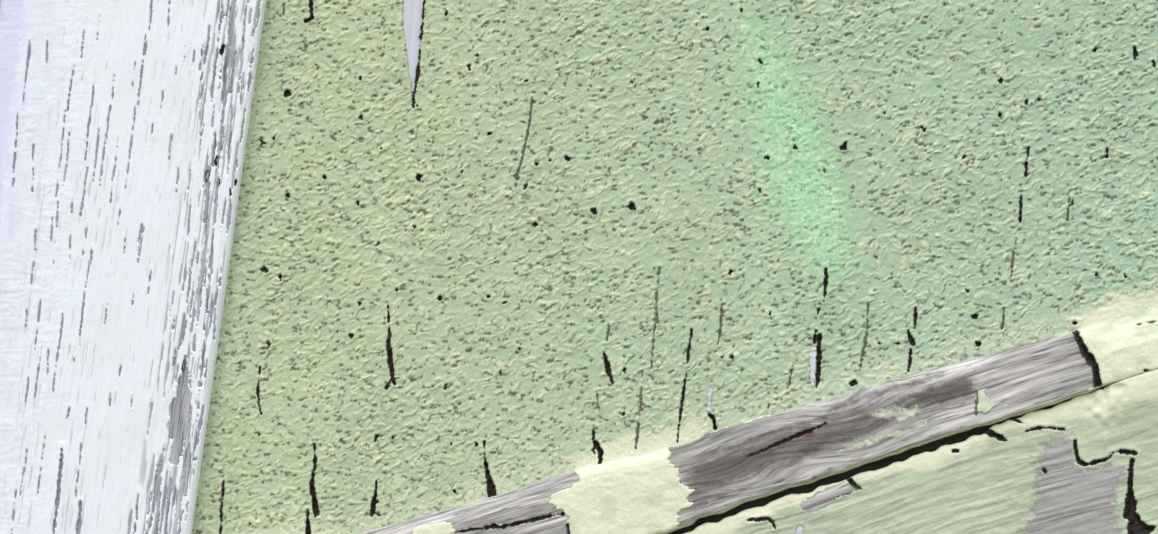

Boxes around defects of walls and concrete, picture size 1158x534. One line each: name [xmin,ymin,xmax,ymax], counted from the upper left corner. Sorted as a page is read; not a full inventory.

crack [11,0,210,534]
peeling [128,0,262,534]
crack [305,443,319,534]
crack [385,306,396,390]
peeling [360,471,580,534]
crack [455,441,570,534]
crack [591,267,660,464]
crack [677,306,723,443]
crack [767,268,829,415]
peeling [668,321,1094,527]
crack [668,330,1137,534]
peeling [1026,438,1156,534]